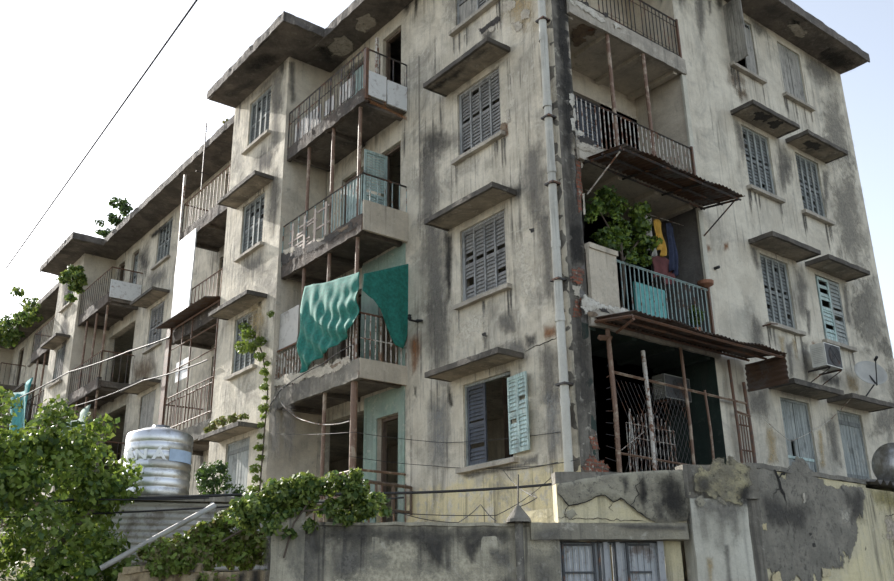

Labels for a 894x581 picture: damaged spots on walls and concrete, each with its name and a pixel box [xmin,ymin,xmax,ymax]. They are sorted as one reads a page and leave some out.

peeling [328,35,353,57]
water stain [422,132,452,362]
water stain [515,145,551,298]
water stain [824,173,864,259]
spalling [274,355,350,387]
corrosion [411,338,419,369]
water stain [501,289,534,353]
water stain [542,349,559,447]
spalling [570,267,629,318]
water stain [843,282,894,433]
flaking render [557,435,739,525]
flaking render [757,456,867,581]